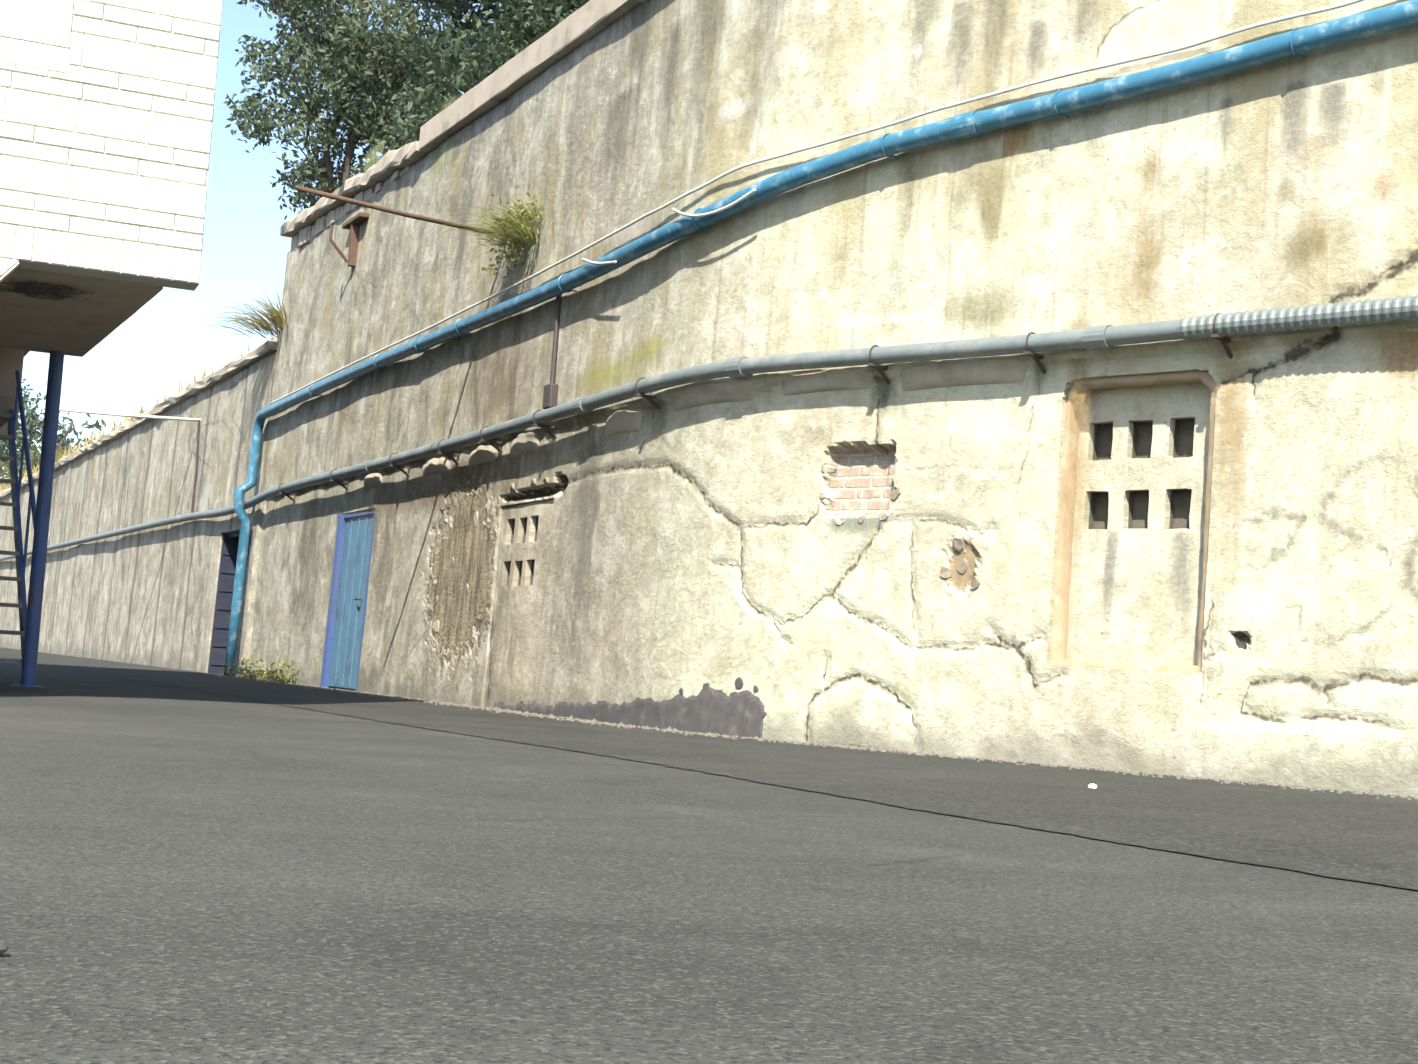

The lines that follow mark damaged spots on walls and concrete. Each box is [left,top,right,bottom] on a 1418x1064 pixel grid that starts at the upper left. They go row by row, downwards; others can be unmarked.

crack [1212,250,1418,395]
spalling [819,442,901,526]
crack [568,463,1061,687]
spalling [940,538,981,593]
crack [1201,595,1215,697]
spalling [1231,632,1250,649]
crack [806,658,917,743]
crack [1241,672,1416,726]